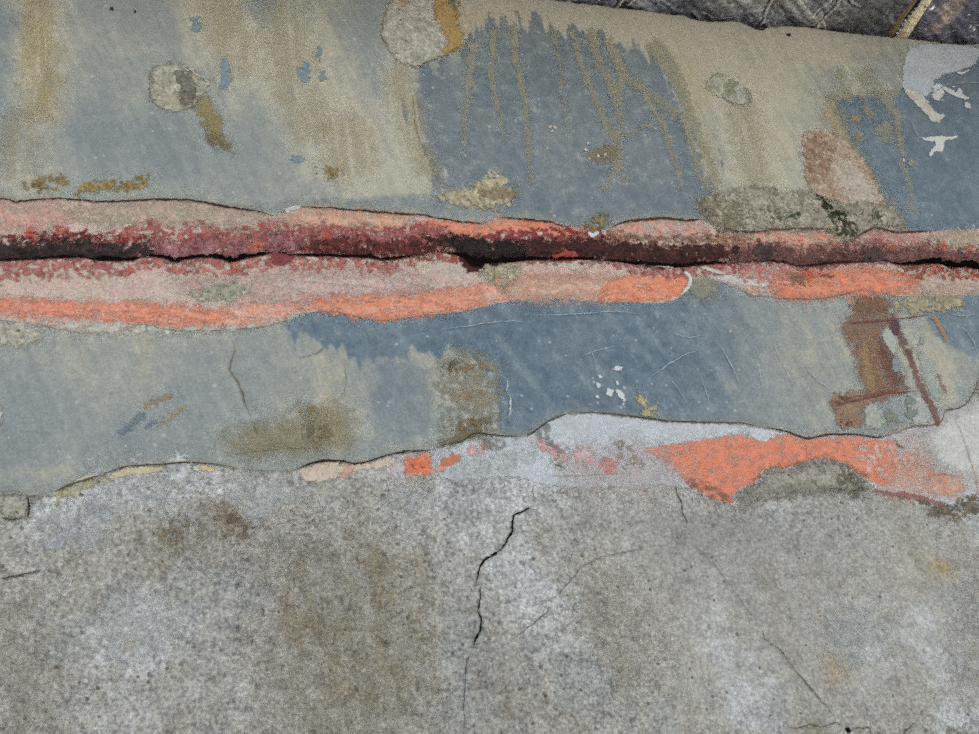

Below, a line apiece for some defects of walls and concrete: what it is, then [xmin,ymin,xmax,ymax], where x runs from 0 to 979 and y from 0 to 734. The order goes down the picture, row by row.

flaking render [380,0,468,68]
leakage [196,97,231,150]
leakage [551,26,675,154]
leakage [646,38,702,169]
peeling [912,123,957,156]
peeling [902,43,979,123]
crack [1,250,418,261]
crack [0,197,567,227]
crack [442,250,733,267]
crack [609,216,979,269]
corrosion [829,296,947,430]
peeling [299,366,979,522]